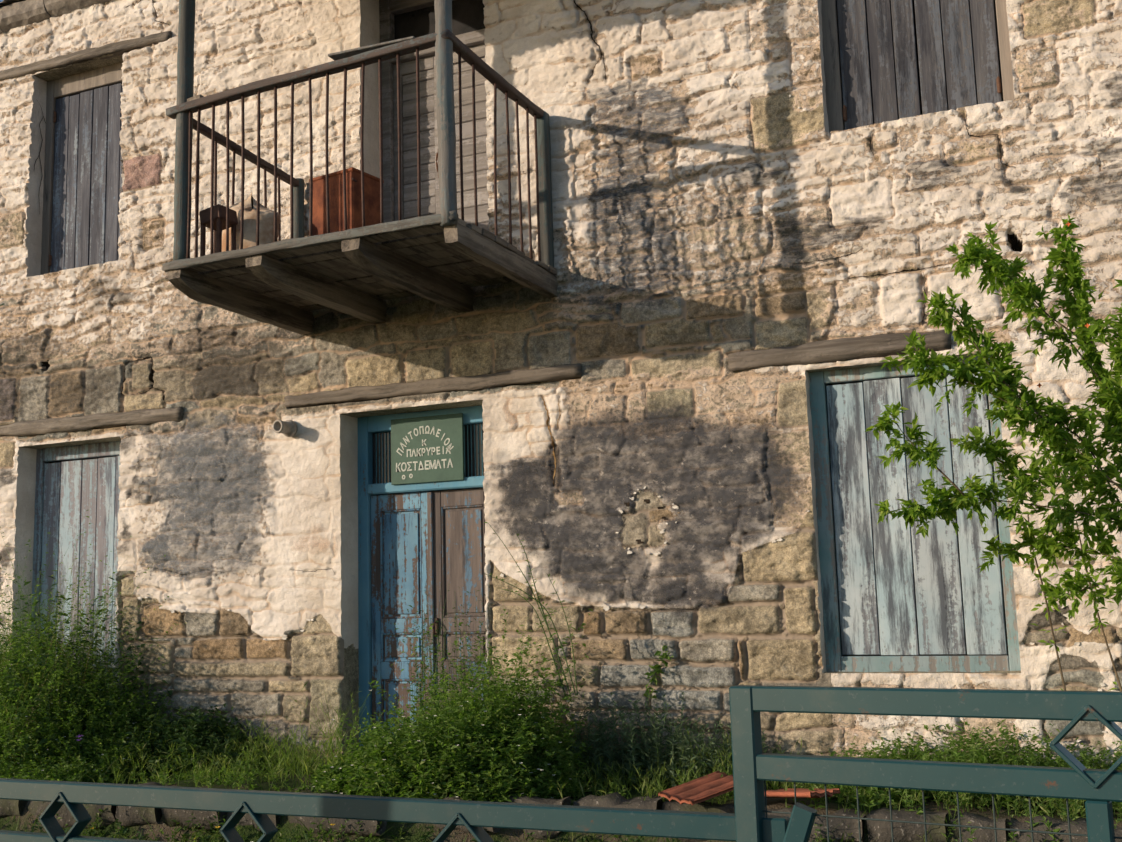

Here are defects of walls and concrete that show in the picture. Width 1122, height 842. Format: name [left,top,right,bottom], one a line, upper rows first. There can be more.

crack [573,0,606,82]
leakage [582,82,689,321]
leakage [119,413,272,582]
leakage [499,459,545,533]
flaking render [116,571,344,765]
flaking render [487,503,833,776]
leakage [642,584,726,616]